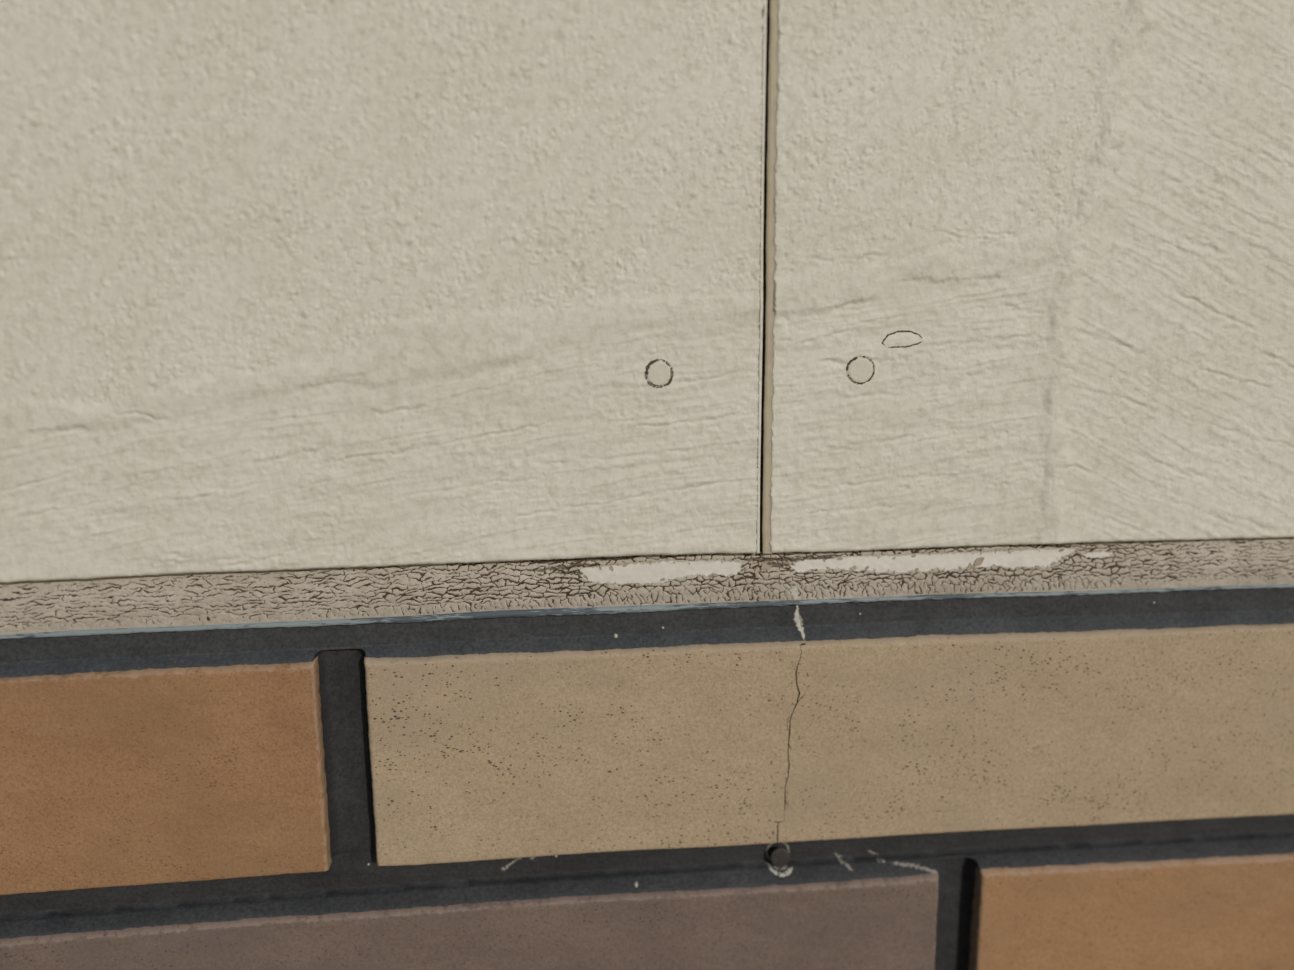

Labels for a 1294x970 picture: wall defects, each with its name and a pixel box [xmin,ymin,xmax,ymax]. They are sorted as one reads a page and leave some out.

crack [0,0,1294,631]
peeling [579,548,1113,586]
crack [774,643,805,844]